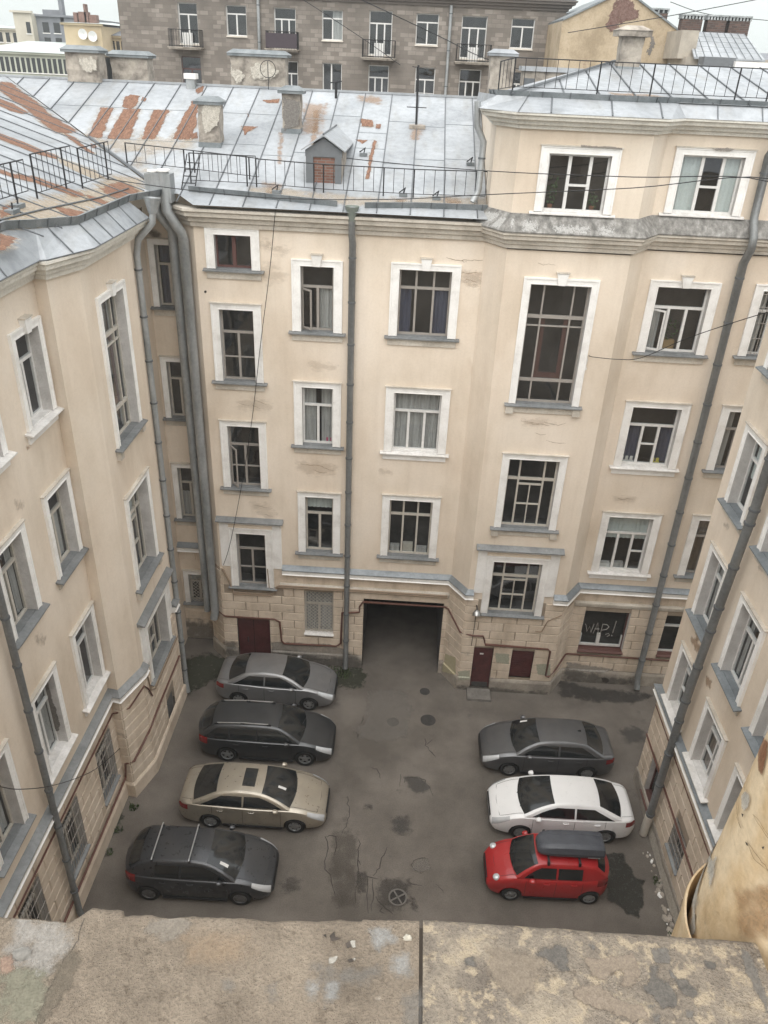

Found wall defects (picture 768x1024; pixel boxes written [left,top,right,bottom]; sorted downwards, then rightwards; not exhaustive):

flaking render [605,0,639,32]
corrosion [0,81,169,154]
corrosion [174,86,204,140]
flaking render [201,104,221,134]
corrosion [357,119,381,179]
crack [324,797,393,914]
damp [606,853,644,917]